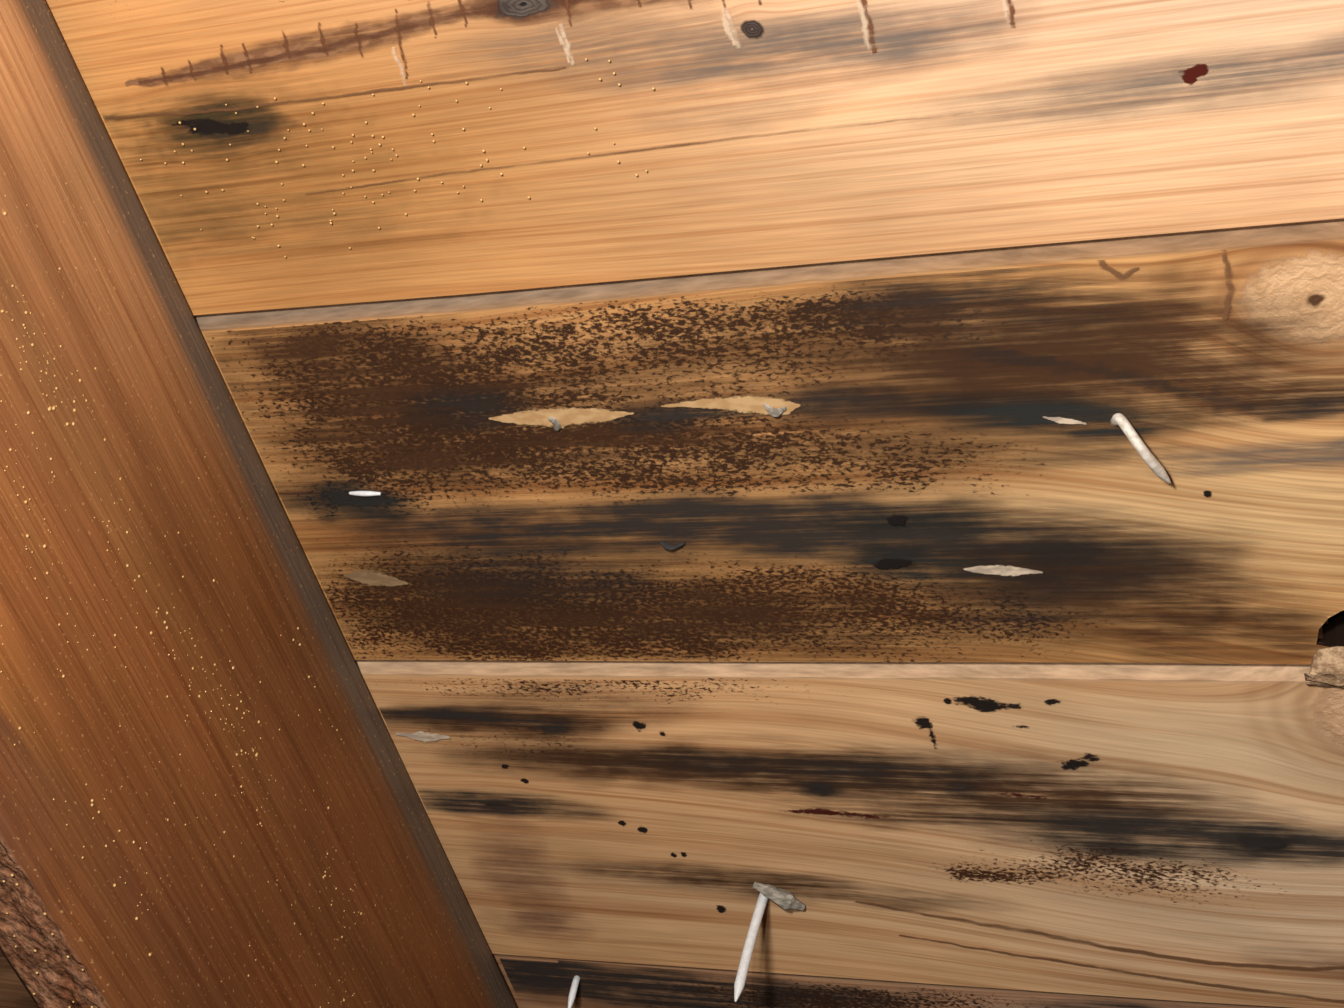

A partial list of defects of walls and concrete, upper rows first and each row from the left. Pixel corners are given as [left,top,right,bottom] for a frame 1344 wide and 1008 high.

water stain [671,18,983,79]
water stain [119,101,277,158]
water stain [211,271,1344,662]
water stain [381,678,1344,905]
water stain [500,959,1009,1008]